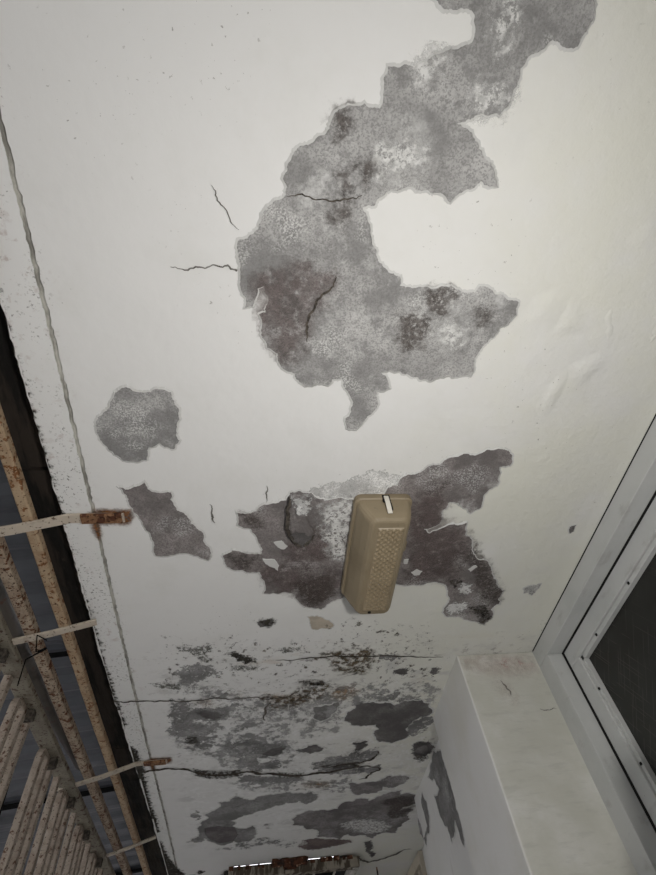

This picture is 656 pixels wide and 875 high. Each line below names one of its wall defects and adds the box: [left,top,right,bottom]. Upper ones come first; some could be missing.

spalling [234,0,598,431]
crack [172,264,237,272]
spalling [93,384,182,464]
spalling [116,446,514,630]
water stain [150,622,434,710]
crack [277,654,436,662]
water stain [197,701,223,720]
crack [143,751,381,780]
water stain [263,746,286,757]
spalling [186,699,465,857]